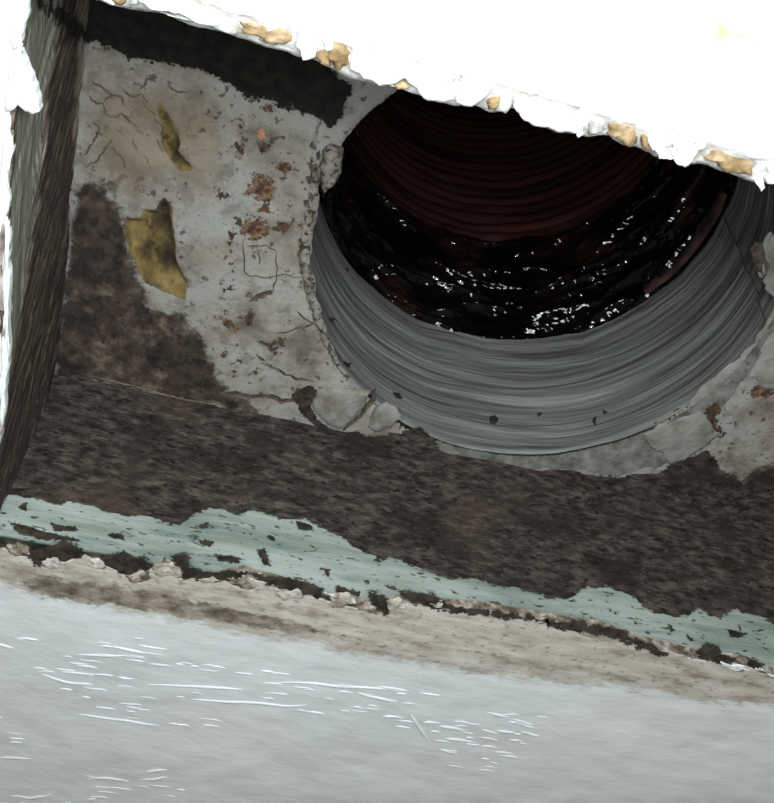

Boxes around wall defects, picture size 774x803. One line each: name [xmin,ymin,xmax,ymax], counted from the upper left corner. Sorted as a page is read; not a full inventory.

peeling [4,0,43,114]
crack [84,77,187,168]
corrosion [234,123,271,155]
peeling [100,0,774,191]
spalling [124,198,187,300]
corrosion [227,158,304,249]
leakage [0,0,774,632]
corrosion [703,400,727,438]
corrosion [747,385,774,400]
spalling [0,534,669,657]
leakage [0,548,774,705]
spalling [679,642,774,677]